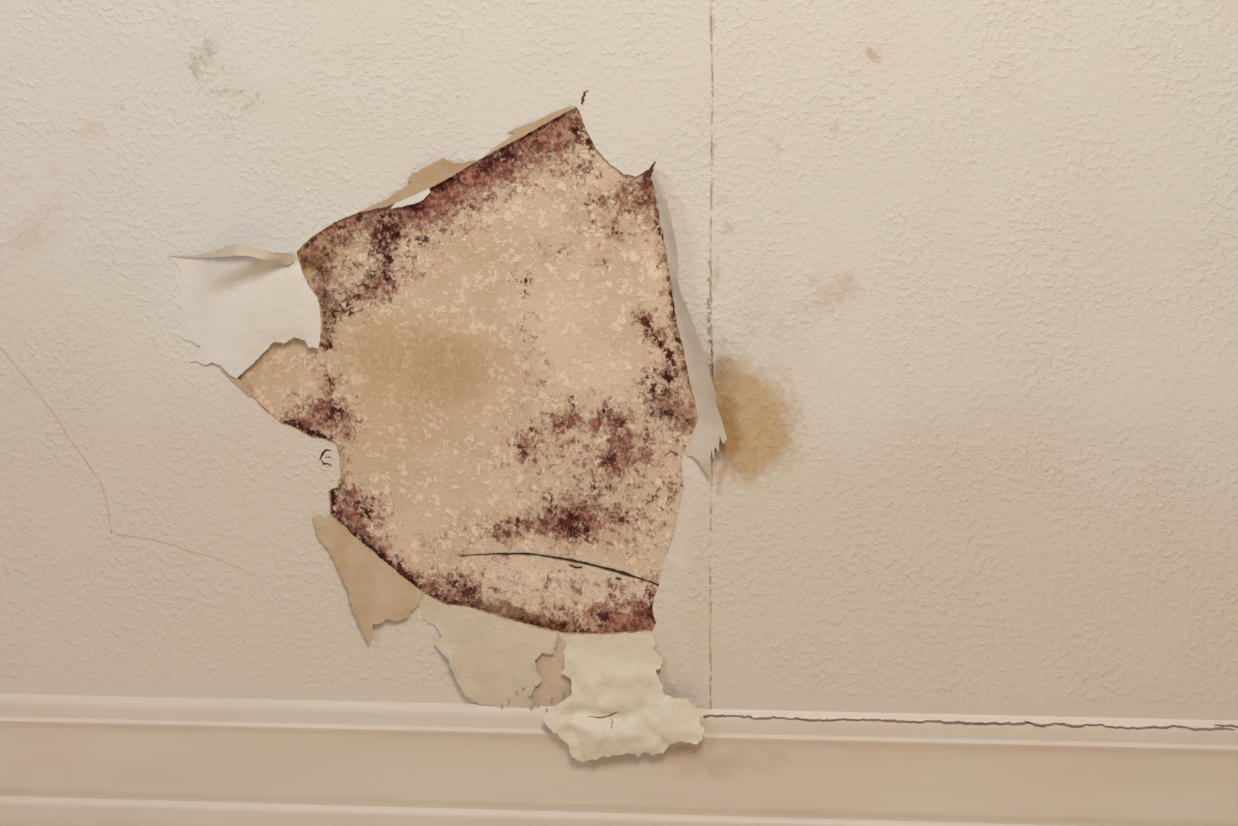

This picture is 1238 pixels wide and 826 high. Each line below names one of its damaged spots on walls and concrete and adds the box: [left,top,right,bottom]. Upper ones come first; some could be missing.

peeling [169,106,727,762]
leakage [280,110,698,633]
crack [460,552,659,586]
crack [706,0,714,378]
leakage [712,369,789,476]
crack [703,450,1238,731]